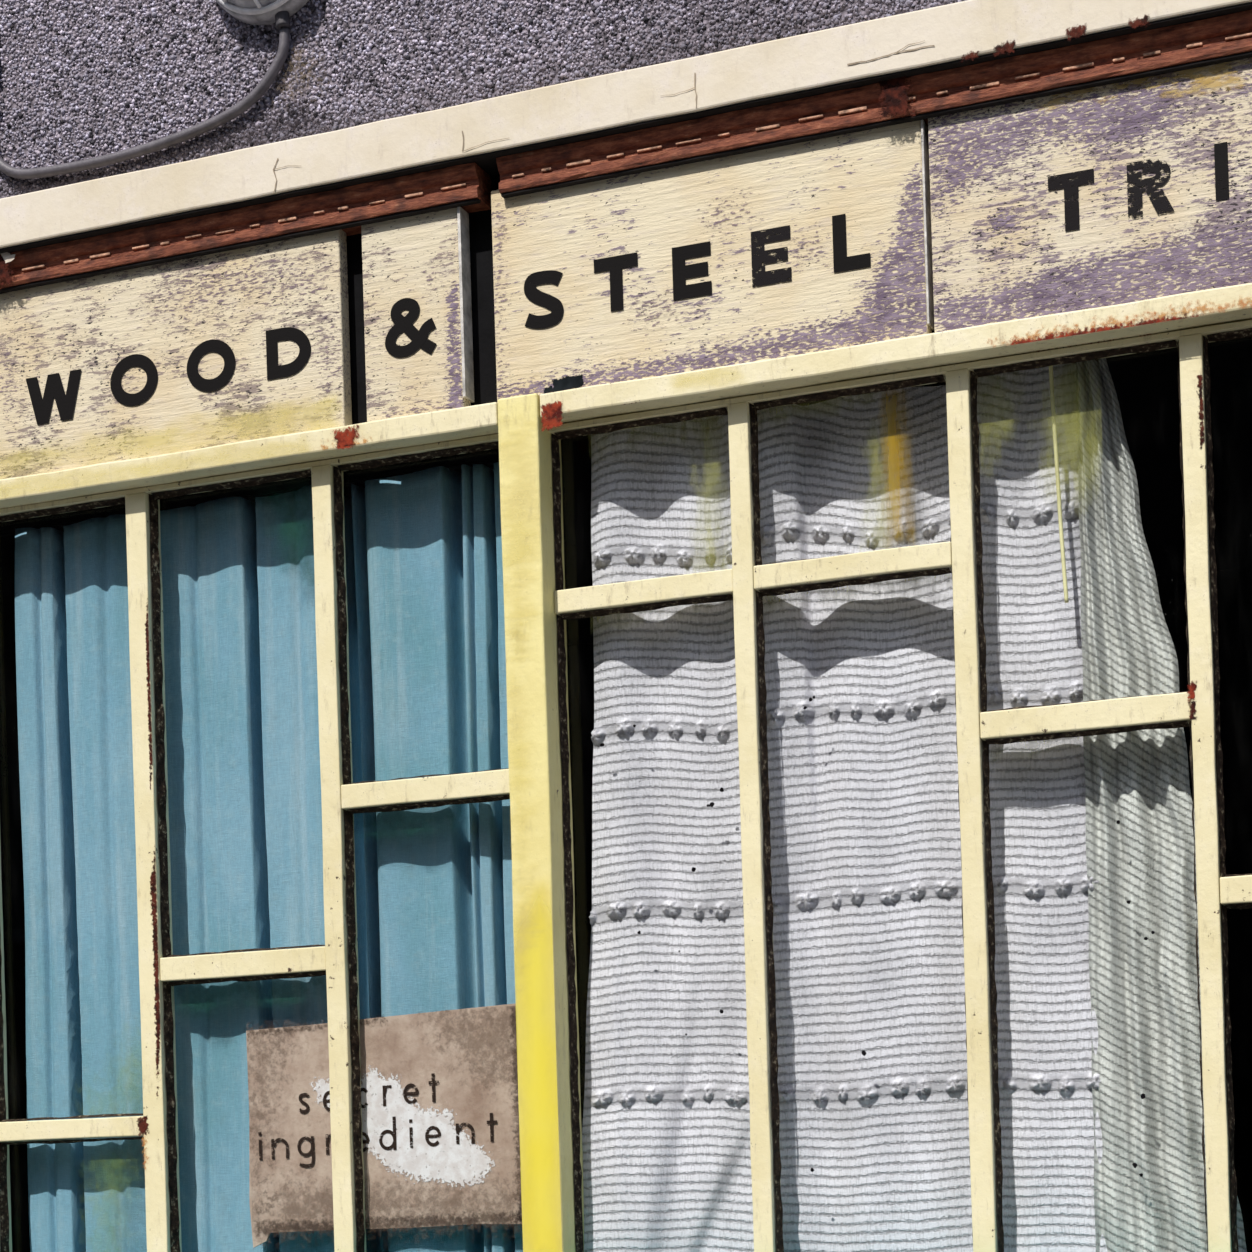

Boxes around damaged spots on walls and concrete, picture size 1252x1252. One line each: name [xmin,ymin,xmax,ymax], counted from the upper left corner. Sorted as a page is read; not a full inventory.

spalling [0,252,16,290]
peeling [491,60,1252,401]
peeling [136,245,342,415]
corrosion [991,298,1252,352]
peeling [0,338,32,427]
corrosion [322,424,366,450]
corrosion [541,401,563,431]
corrosion [145,598,153,789]
corrosion [150,851,160,1096]
corrosion [137,1116,149,1169]